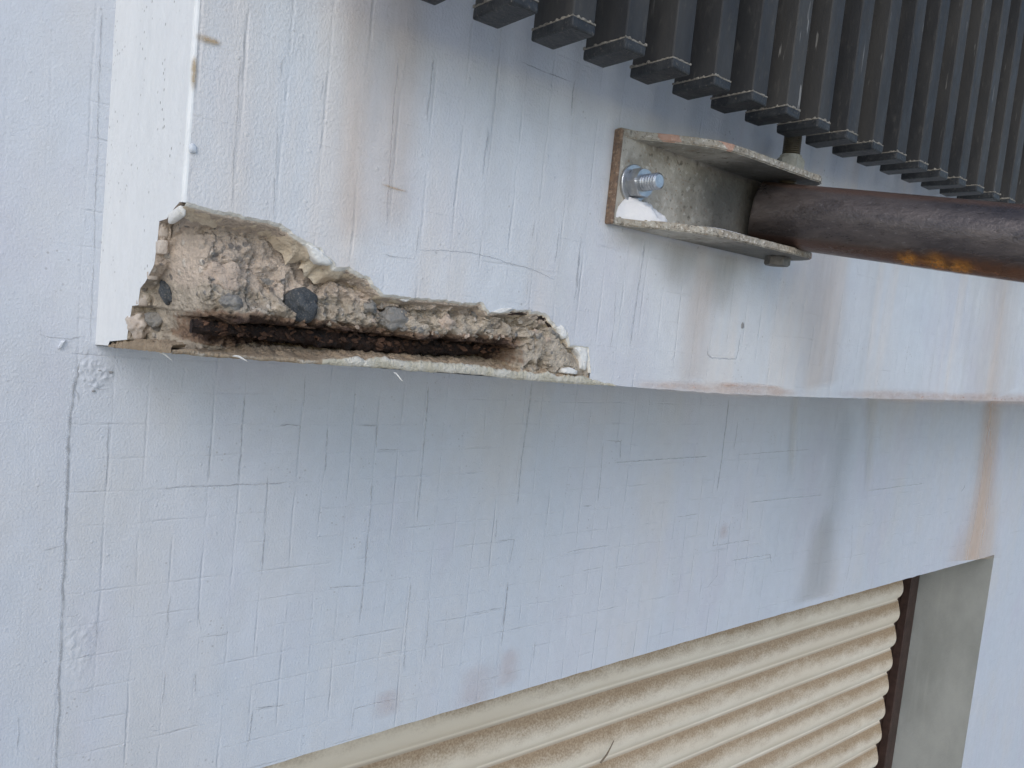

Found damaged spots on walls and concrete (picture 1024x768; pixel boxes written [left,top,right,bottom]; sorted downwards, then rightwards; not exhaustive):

spalling [108,202,616,386]
rust [900,256,1018,280]
crack [62,367,79,600]
crack [55,634,63,743]